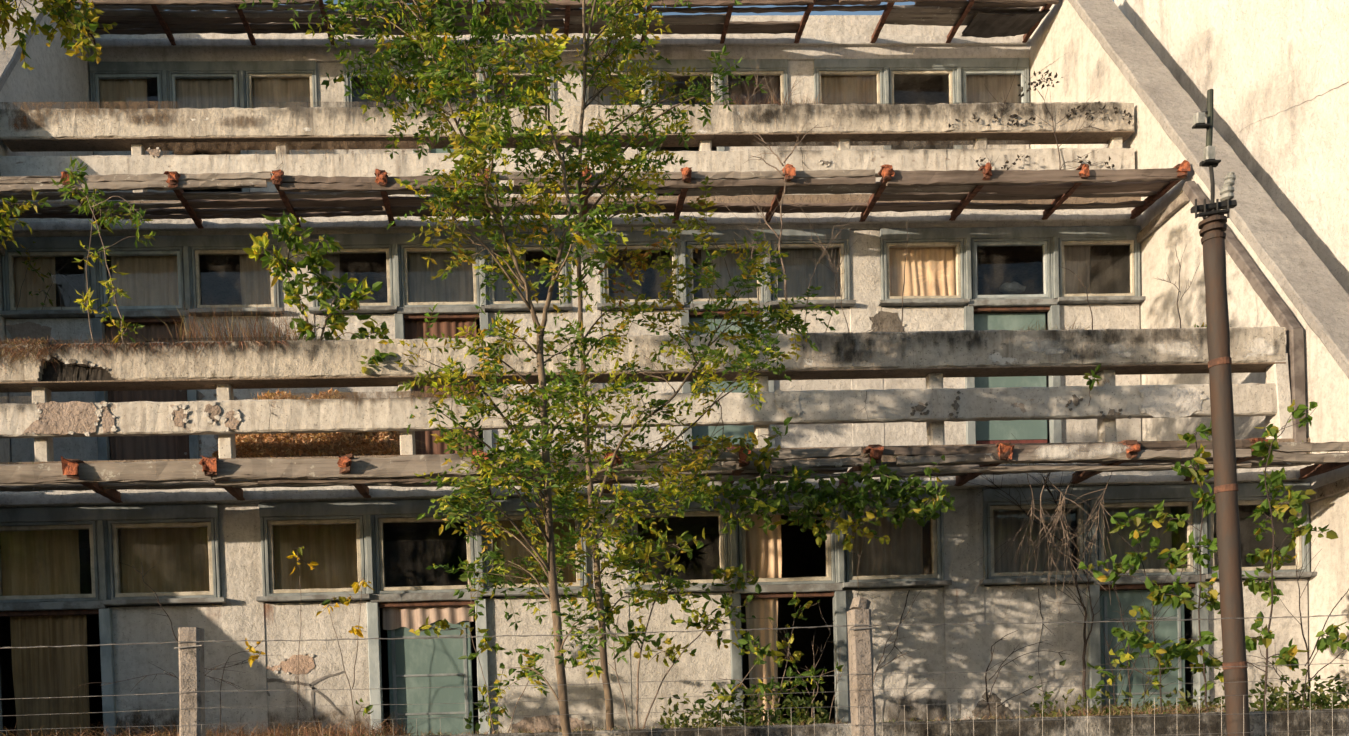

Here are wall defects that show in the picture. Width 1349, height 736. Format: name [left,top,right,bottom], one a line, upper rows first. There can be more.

damp [0,101,172,129]
damp [221,116,258,126]
damp [752,103,828,122]
damp [847,102,1118,118]
damp [161,141,424,160]
spalling [866,310,905,332]
spalling [5,322,114,381]
mould [805,332,875,362]
mould [904,330,984,345]
damp [1030,328,1207,358]
damp [1256,339,1277,354]
peeling [23,400,117,436]